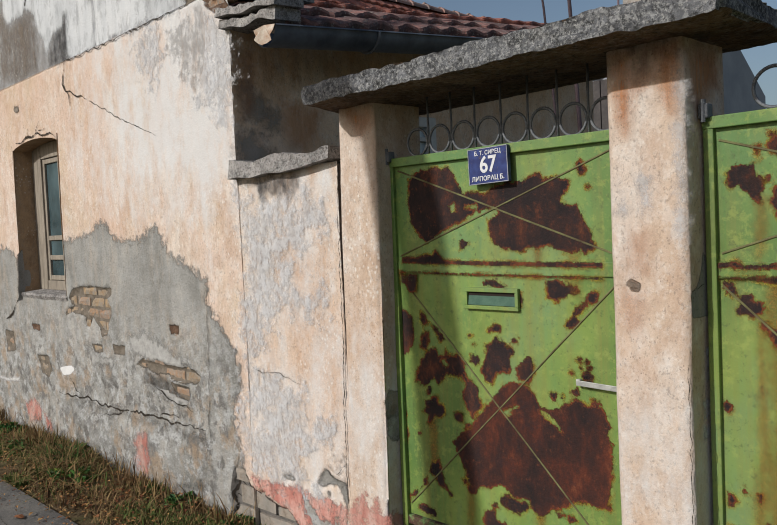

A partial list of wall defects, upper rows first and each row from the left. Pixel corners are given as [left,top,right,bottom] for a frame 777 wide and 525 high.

leakage [53,24,66,62]
crack [62,4,187,133]
peeling [0,0,281,161]
rust [724,129,777,220]
crack [59,376,211,454]
peeling [0,183,348,525]
rust [399,158,603,329]
rust [402,309,615,525]
spalling [691,253,708,318]
rust [717,259,777,347]